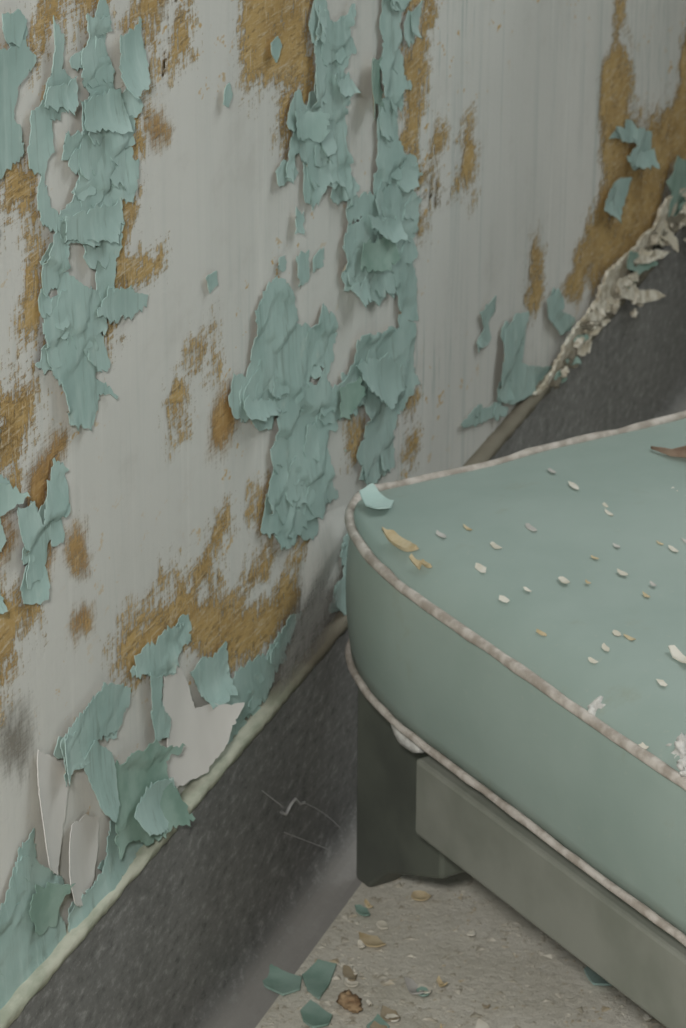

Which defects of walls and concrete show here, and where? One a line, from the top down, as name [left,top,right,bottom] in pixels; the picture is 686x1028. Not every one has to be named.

peeling [0,0,481,1010]
peeling [461,0,686,428]